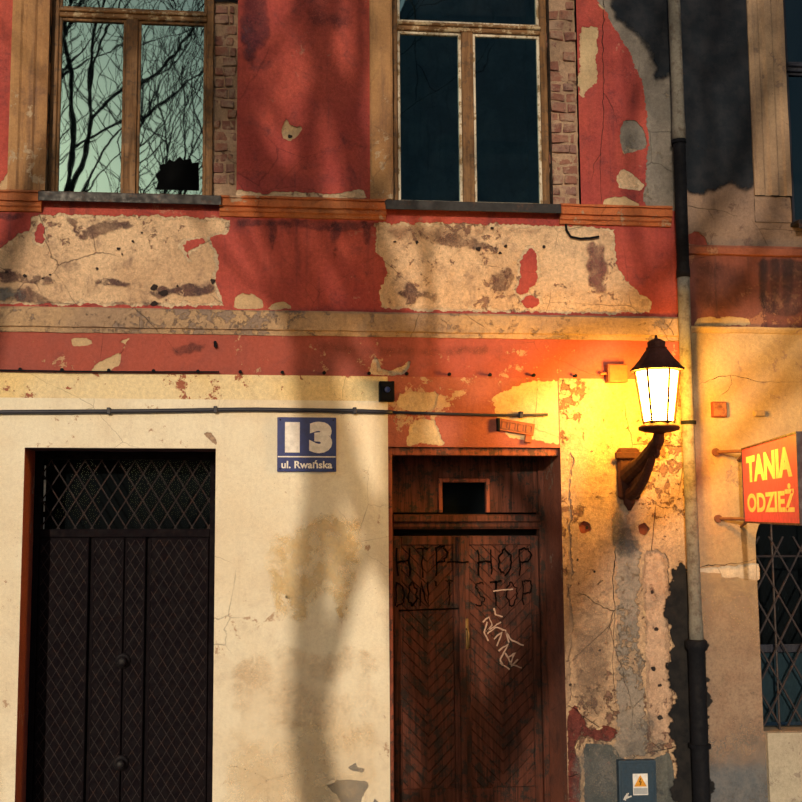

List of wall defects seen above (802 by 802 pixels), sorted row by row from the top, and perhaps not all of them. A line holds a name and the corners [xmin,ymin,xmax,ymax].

crack [593,0,618,202]
peeling [597,0,675,211]
peeling [0,212,230,308]
peeling [234,292,291,310]
peeling [374,219,652,316]
peeling [492,379,560,444]
spalling [638,523,650,535]
flaking render [565,452,617,802]
spalling [641,549,673,755]
spalling [327,763,369,802]